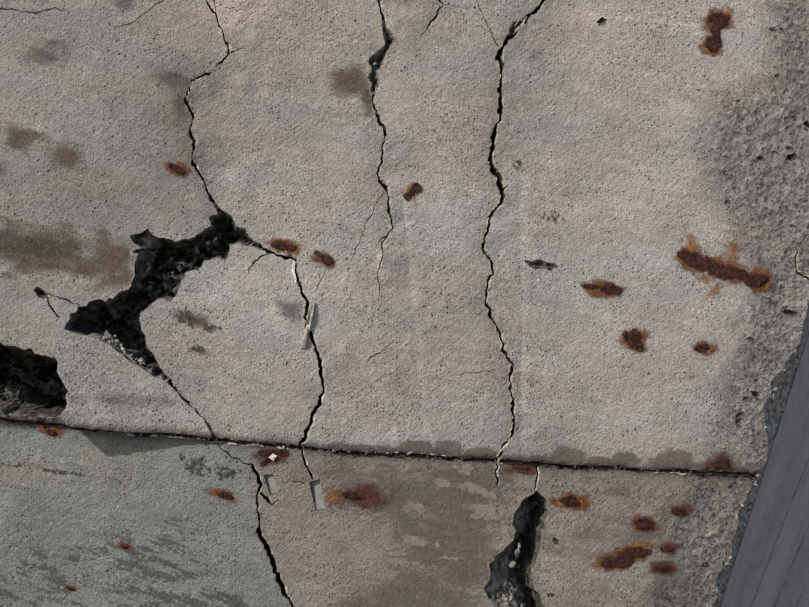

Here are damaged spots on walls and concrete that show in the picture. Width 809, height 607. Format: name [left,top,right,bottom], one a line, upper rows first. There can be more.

corrosion [698,8,733,56]
crack [183,0,243,203]
spalling [0,343,68,418]
spalling [64,202,263,381]
crack [167,246,326,607]
crack [351,83,394,321]
crack [459,0,545,486]
corrosion [580,279,623,298]
corrosion [619,329,648,352]
corrosion [676,234,773,297]
spalling [484,490,555,607]
corrosion [594,542,679,574]